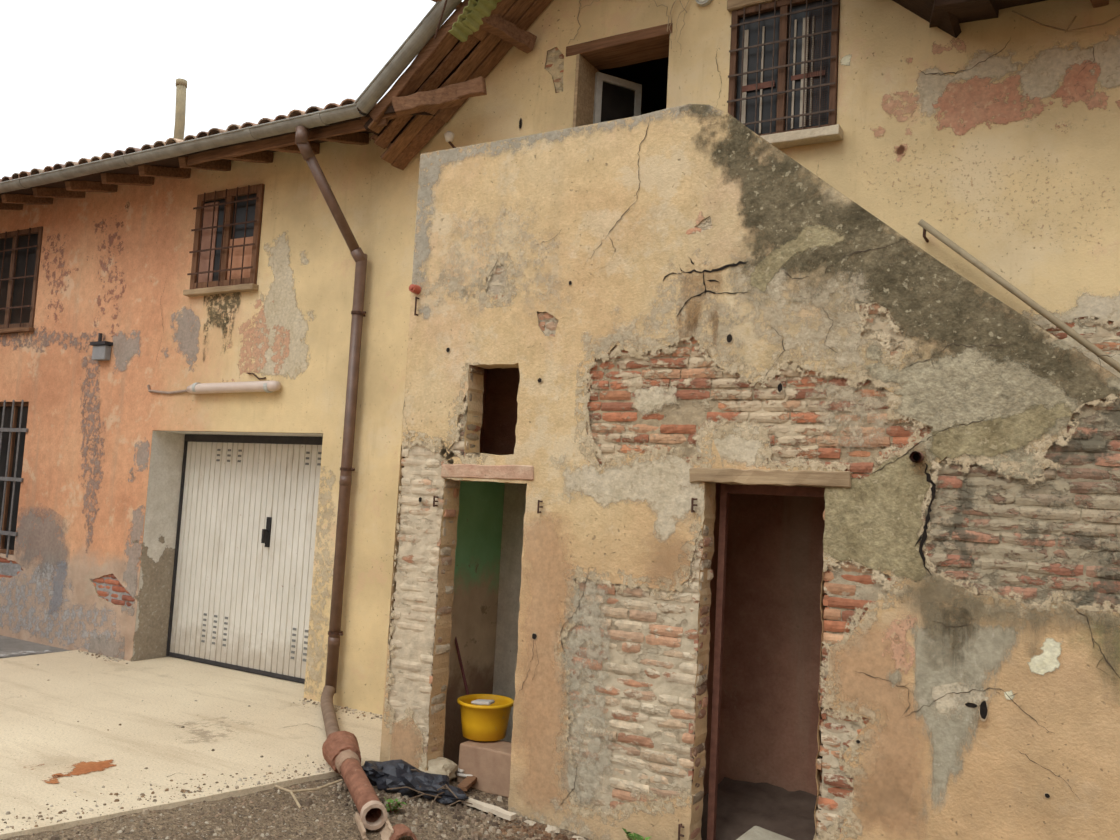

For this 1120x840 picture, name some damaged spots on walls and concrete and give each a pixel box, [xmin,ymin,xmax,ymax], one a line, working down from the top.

peeling [222,232,314,382]
spalling [538,312,559,337]
crack [585,116,650,264]
crack [663,258,749,316]
leakage [679,104,1120,404]
peeling [857,32,1120,251]
spalling [0,557,23,578]
peeling [91,536,175,662]
spalling [551,293,1120,840]
crack [852,416,990,575]
crack [858,672,1053,733]
leakage [906,572,1047,805]